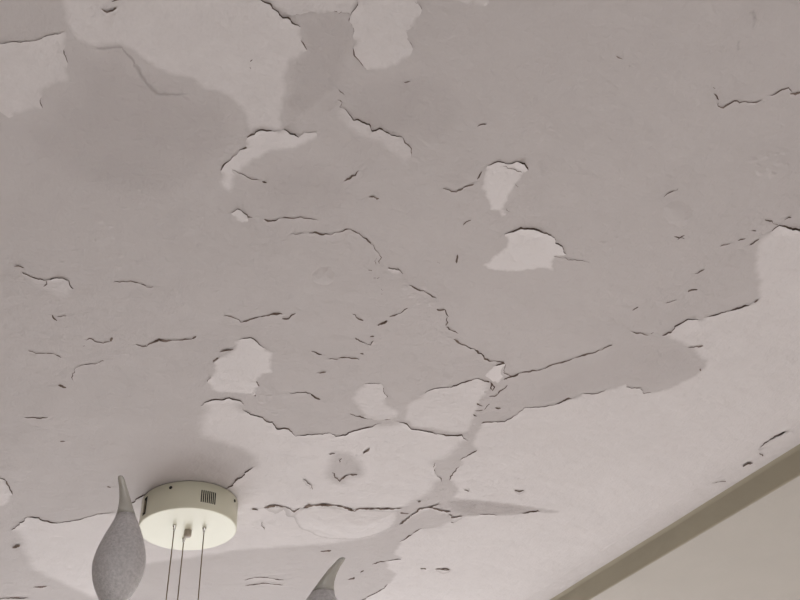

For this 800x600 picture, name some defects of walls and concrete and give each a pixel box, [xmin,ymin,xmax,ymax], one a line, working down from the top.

peeling [0,0,422,195]
crack [713,87,800,111]
peeling [481,161,528,218]
crack [28,337,113,388]
crack [134,336,196,353]
crack [223,313,296,327]
peeling [143,217,800,600]
peeling [132,494,146,523]
crack [252,479,462,528]
peeling [12,511,117,600]